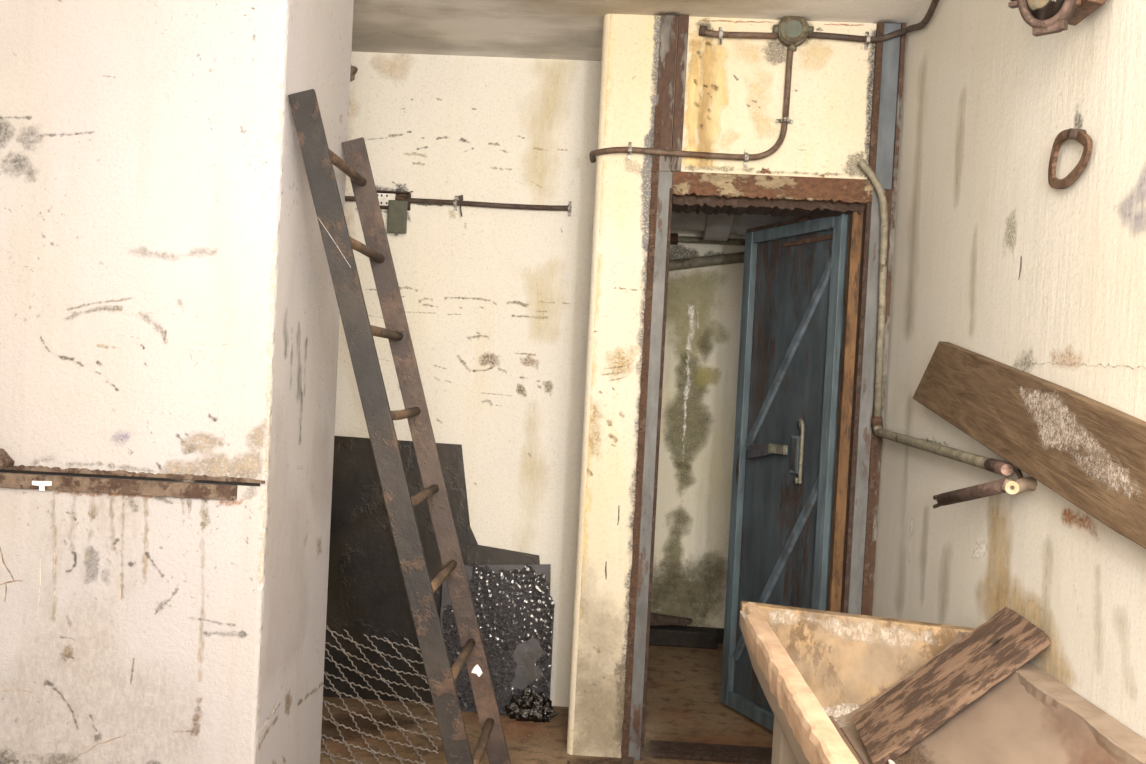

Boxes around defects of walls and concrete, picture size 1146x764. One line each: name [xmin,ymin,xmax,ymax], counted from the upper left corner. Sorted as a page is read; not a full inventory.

damp [666,275,723,487]
crack [1030,362,1146,370]
damp [582,406,624,561]
damp [665,502,689,576]